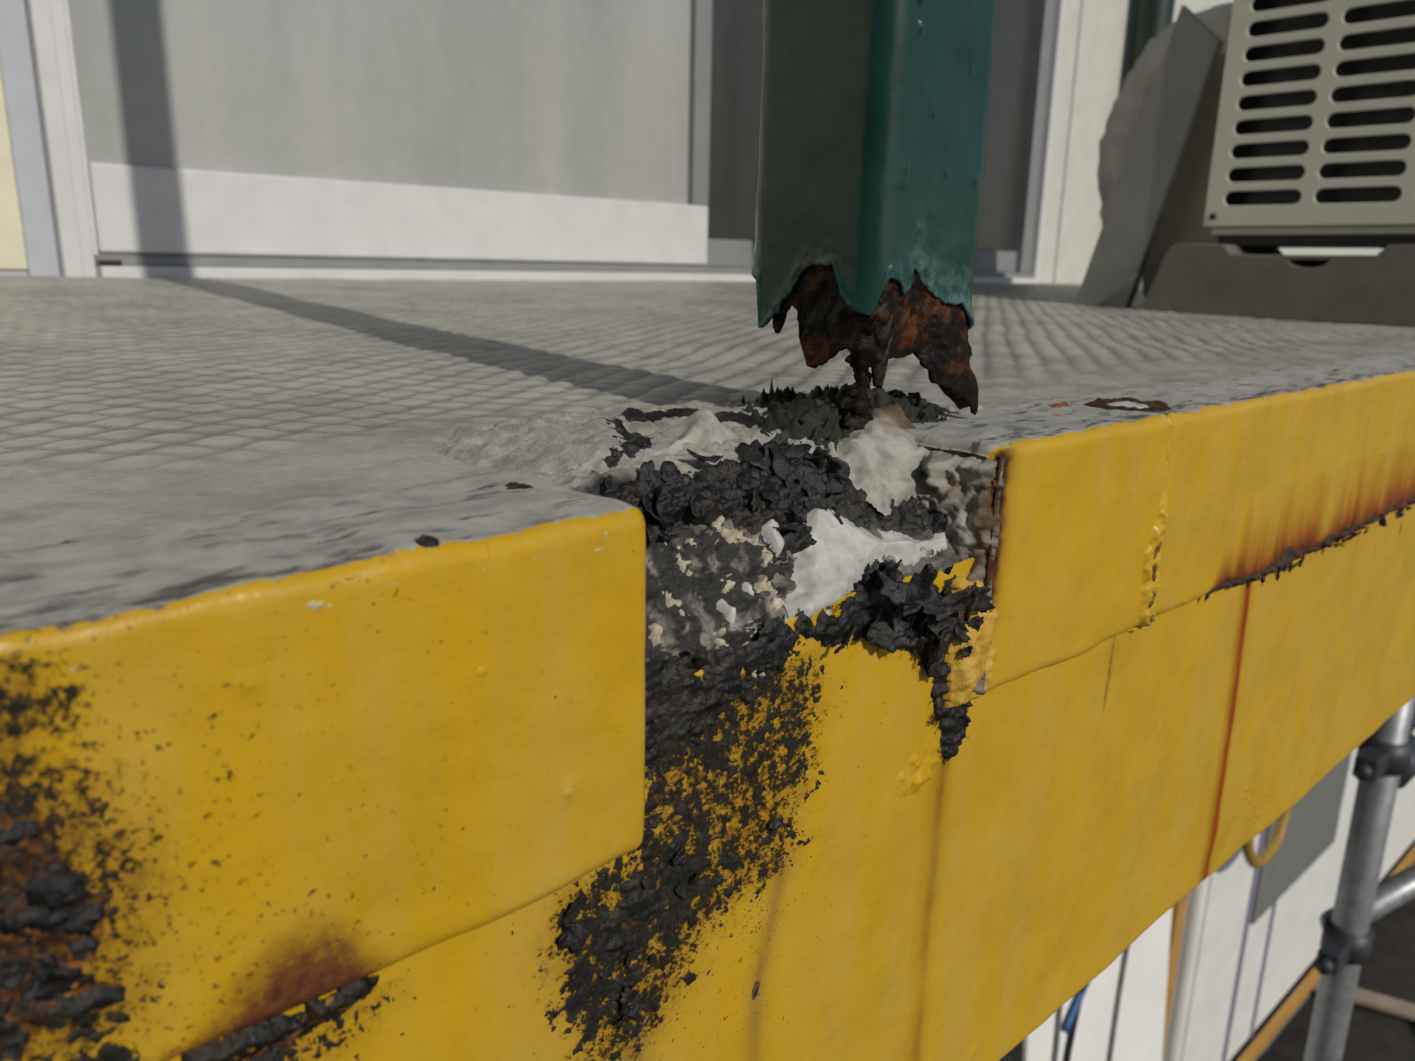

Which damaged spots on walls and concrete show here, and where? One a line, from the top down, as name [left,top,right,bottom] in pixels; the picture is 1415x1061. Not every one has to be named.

corrosion [772,265,979,415]
corrosion [0,648,175,1061]
corrosion [207,938,377,1061]
peeling [307,600,332,612]
spalling [429,392,1006,1061]
corrosion [811,449,1012,767]
corrosion [1202,475,1415,881]